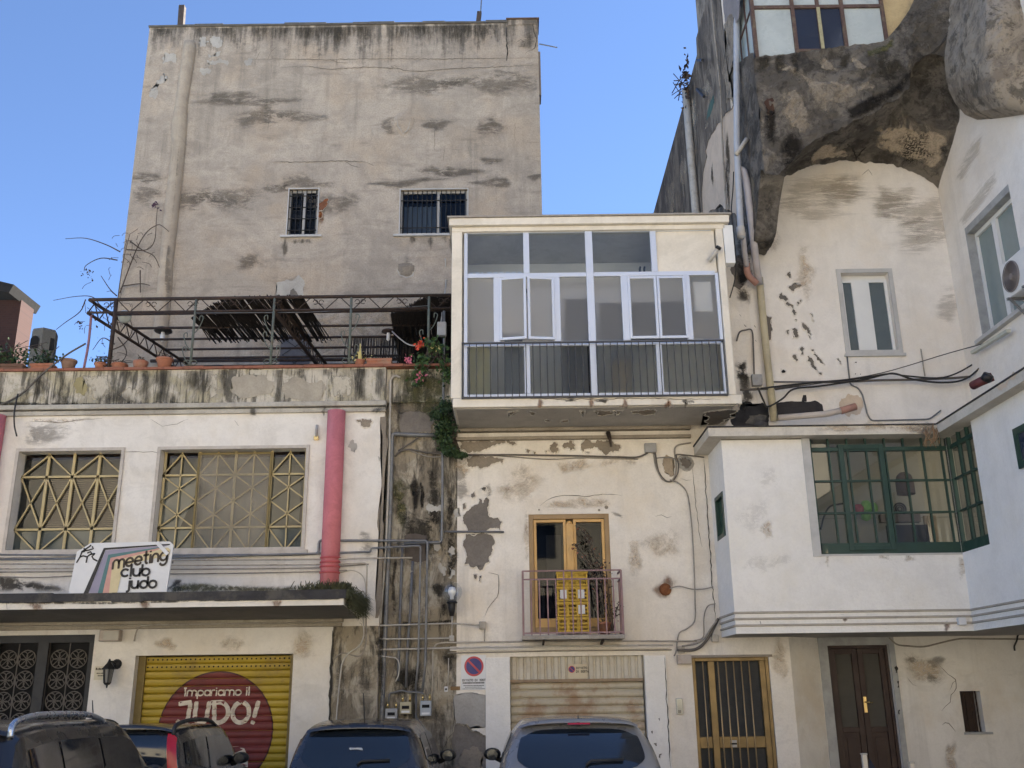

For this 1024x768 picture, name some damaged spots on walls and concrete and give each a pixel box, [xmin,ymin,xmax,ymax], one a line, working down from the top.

leakage [256,27,366,40]
peeling [199,36,229,76]
peeling [766,271,842,376]
leakage [0,372,75,405]
leakage [94,371,175,404]
peeling [231,370,351,402]
leakage [355,369,383,397]
peeling [507,404,675,423]
peeling [459,439,622,470]
leakage [393,471,457,575]
peeling [404,486,503,583]
leakage [403,584,451,624]